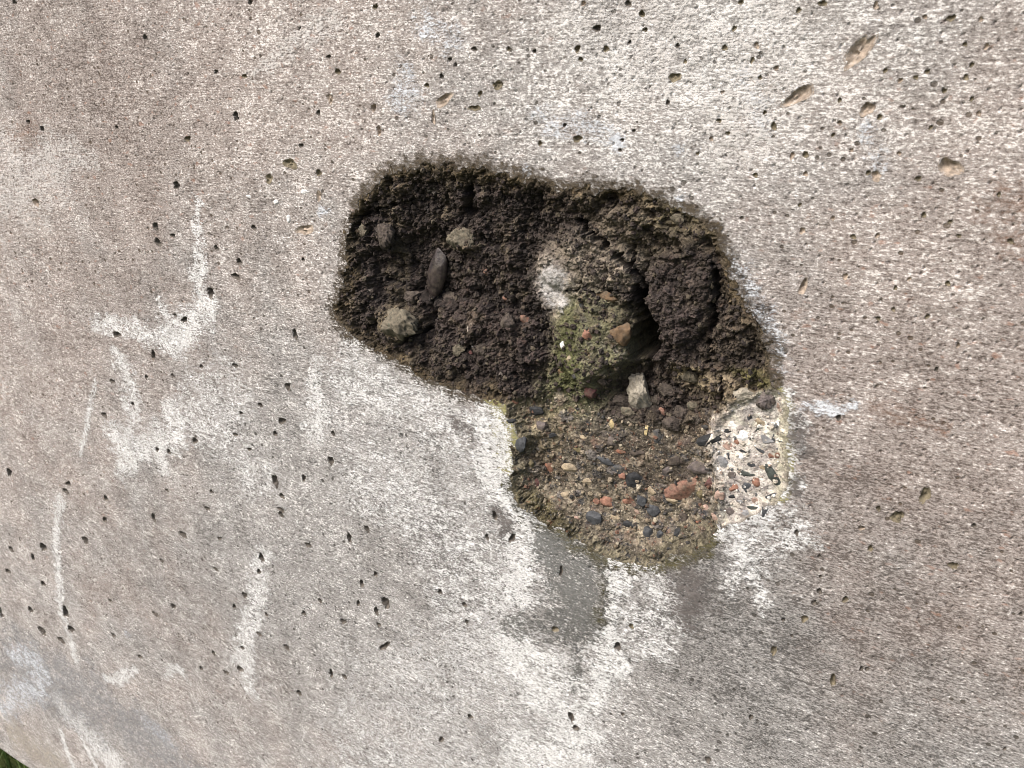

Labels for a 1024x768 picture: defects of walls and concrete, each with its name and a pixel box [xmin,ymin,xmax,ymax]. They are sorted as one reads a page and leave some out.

spalling [332,161,791,567]